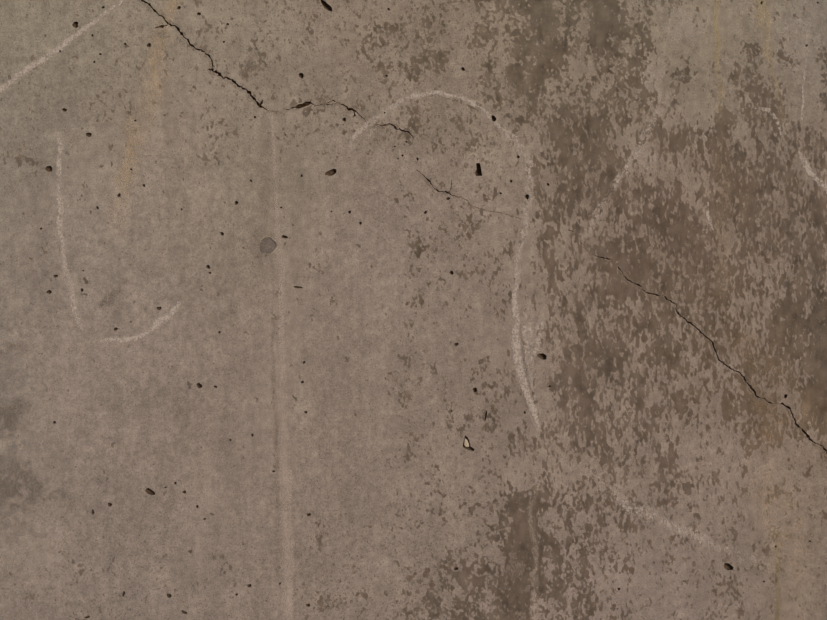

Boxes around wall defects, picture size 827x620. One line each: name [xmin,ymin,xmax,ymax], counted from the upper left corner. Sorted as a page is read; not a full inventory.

crack [141,0,413,137]
crack [416,169,520,219]
crack [569,230,827,454]